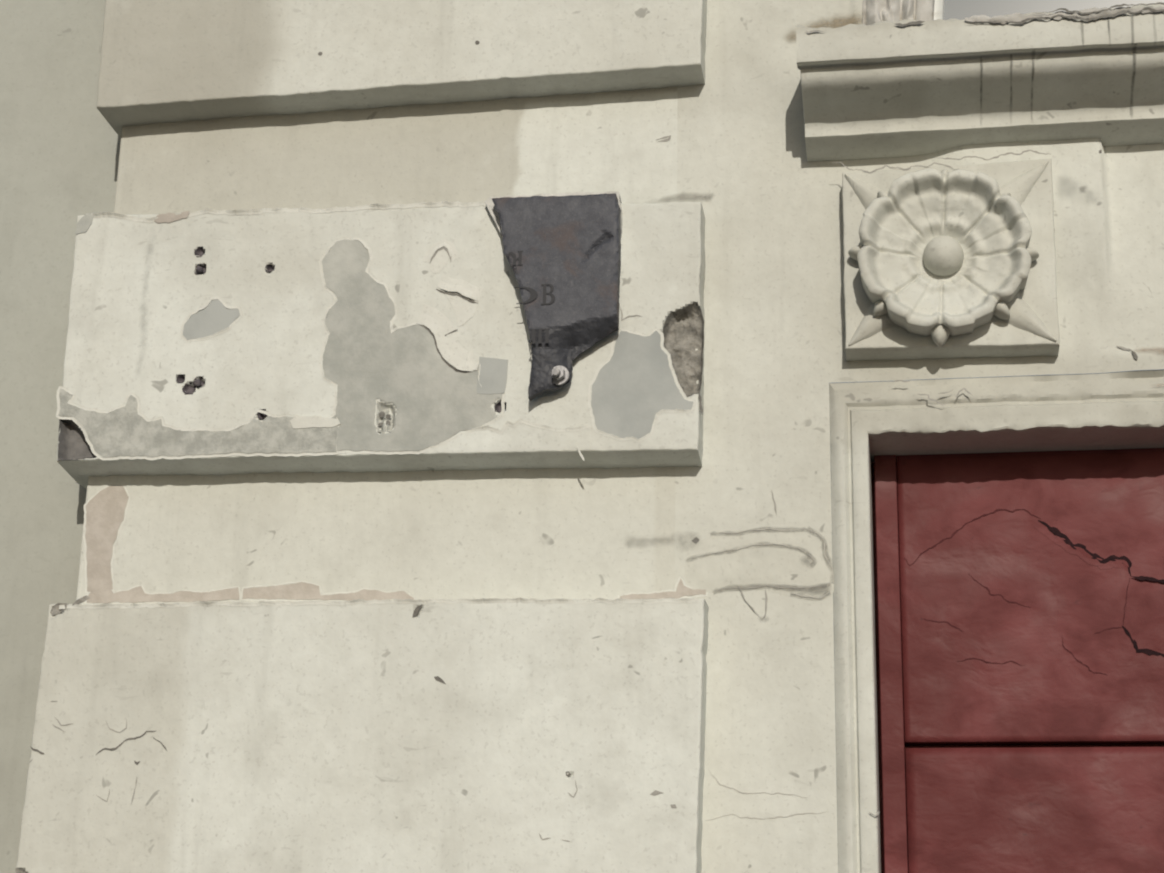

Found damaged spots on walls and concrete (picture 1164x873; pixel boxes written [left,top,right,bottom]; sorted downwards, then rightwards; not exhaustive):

peeling [75,201,486,235]
peeling [56,237,704,461]
peeling [50,483,708,618]
crack [738,586,768,619]
crack [925,619,1023,666]
crack [906,509,1164,657]